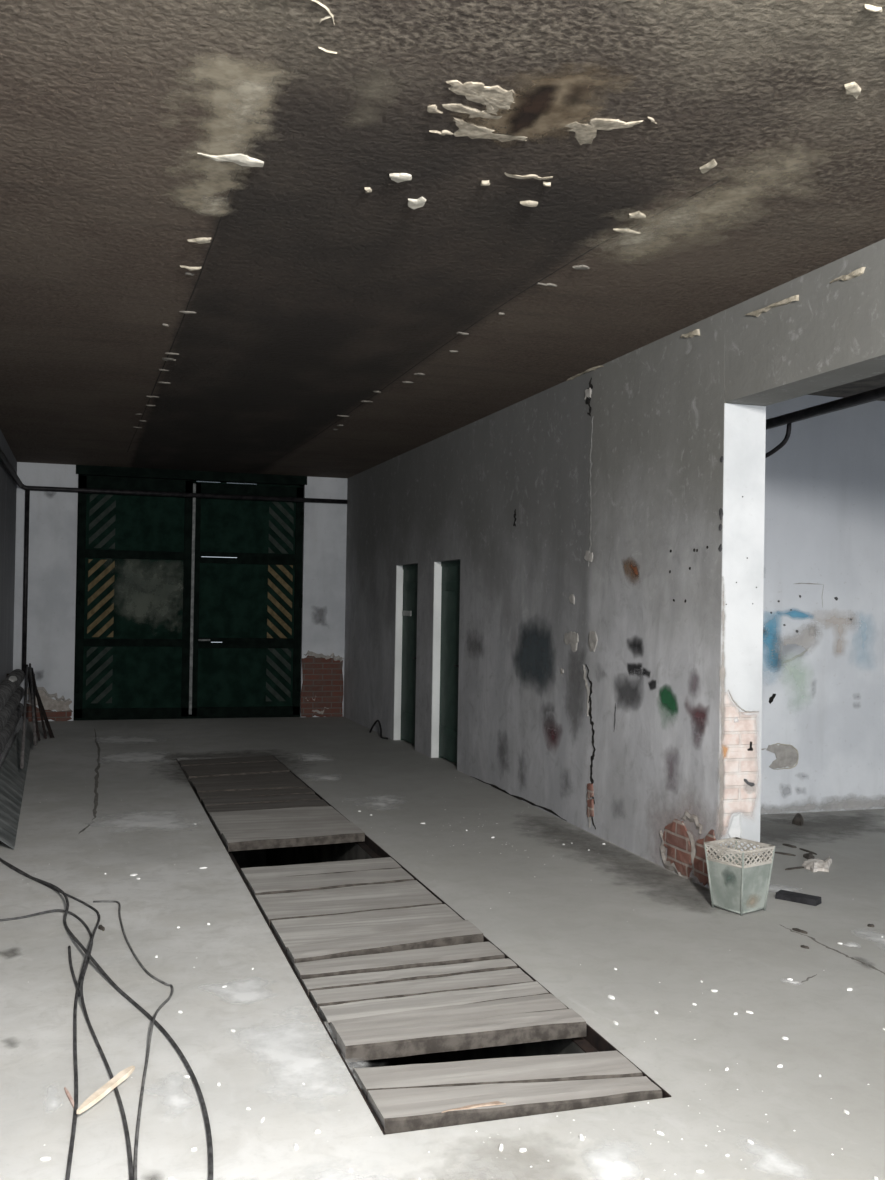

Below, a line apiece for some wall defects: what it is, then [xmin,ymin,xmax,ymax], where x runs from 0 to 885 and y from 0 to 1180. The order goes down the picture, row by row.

water stain [167,57,281,215]
flaking render [504,172,553,187]
flaking render [427,67,657,145]
water stain [619,146,820,261]
crack [584,378,593,567]
flaking render [301,650,344,717]
peeling [660,690,799,886]
crack [781,925,885,974]